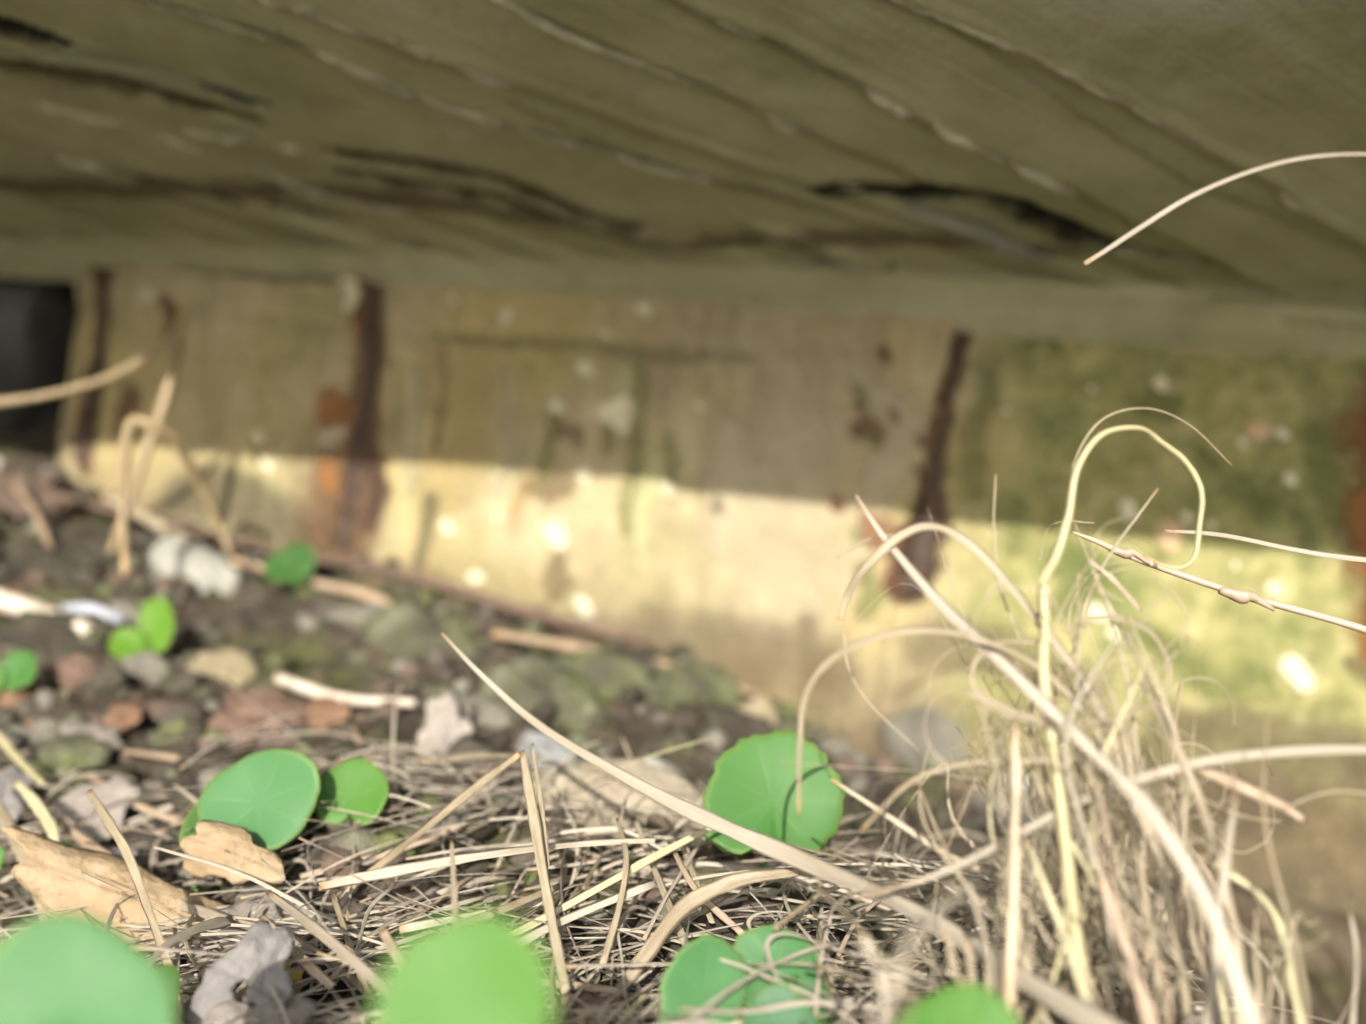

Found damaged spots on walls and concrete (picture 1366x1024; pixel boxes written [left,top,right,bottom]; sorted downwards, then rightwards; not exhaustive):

crack [320,147,644,232]
crack [810,180,1168,254]
rust [302,278,392,559]
rust [850,402,900,444]
rust [831,495,844,513]
rust [860,331,972,604]
rust [1335,393,1366,678]